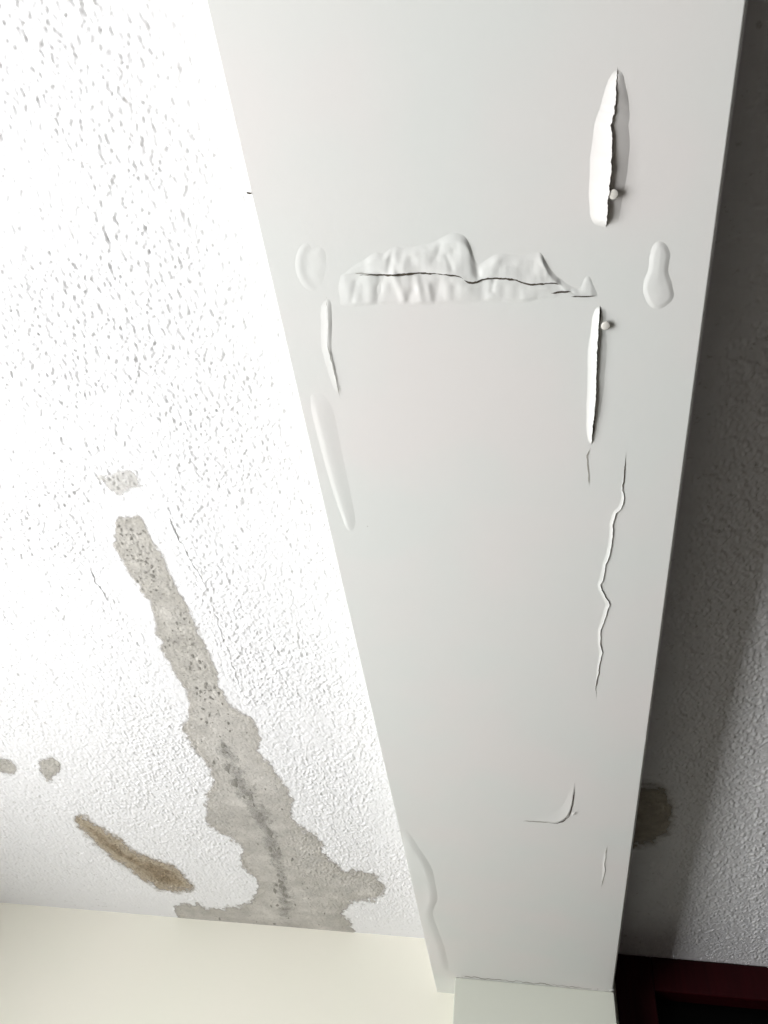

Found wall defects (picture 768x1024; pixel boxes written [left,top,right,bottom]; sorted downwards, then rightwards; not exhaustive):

peeling [589,67,630,227]
peeling [586,306,607,482]
crack [595,458,626,697]
water stain [113,516,385,932]
crack [528,785,575,824]
water stain [633,788,672,848]